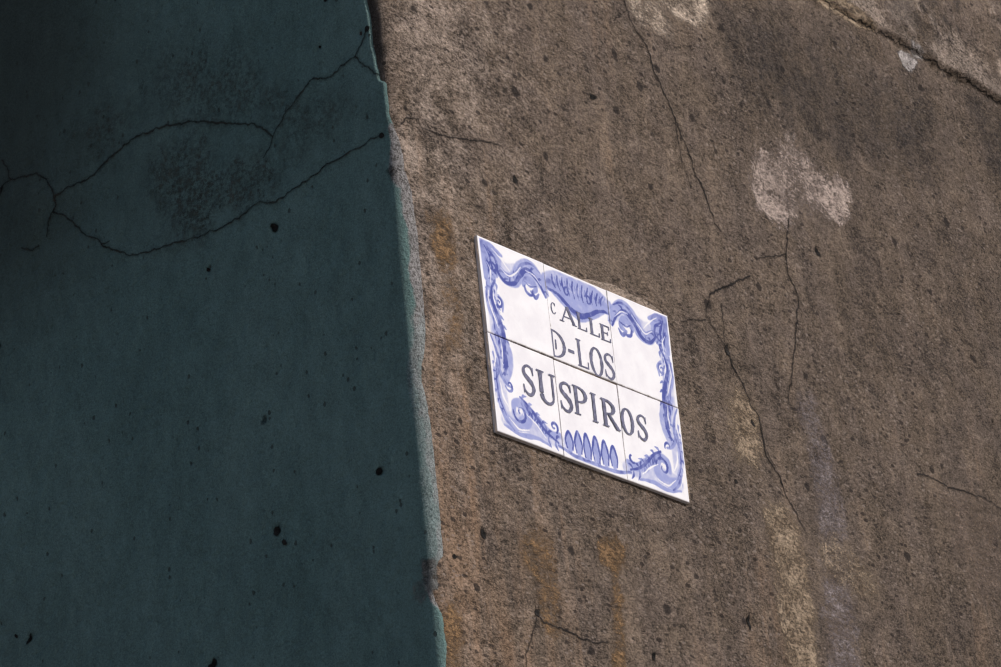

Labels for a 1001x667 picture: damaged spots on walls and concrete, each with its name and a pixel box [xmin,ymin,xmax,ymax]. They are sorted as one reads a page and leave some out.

crack [0,31,380,256]
crack [400,117,502,146]